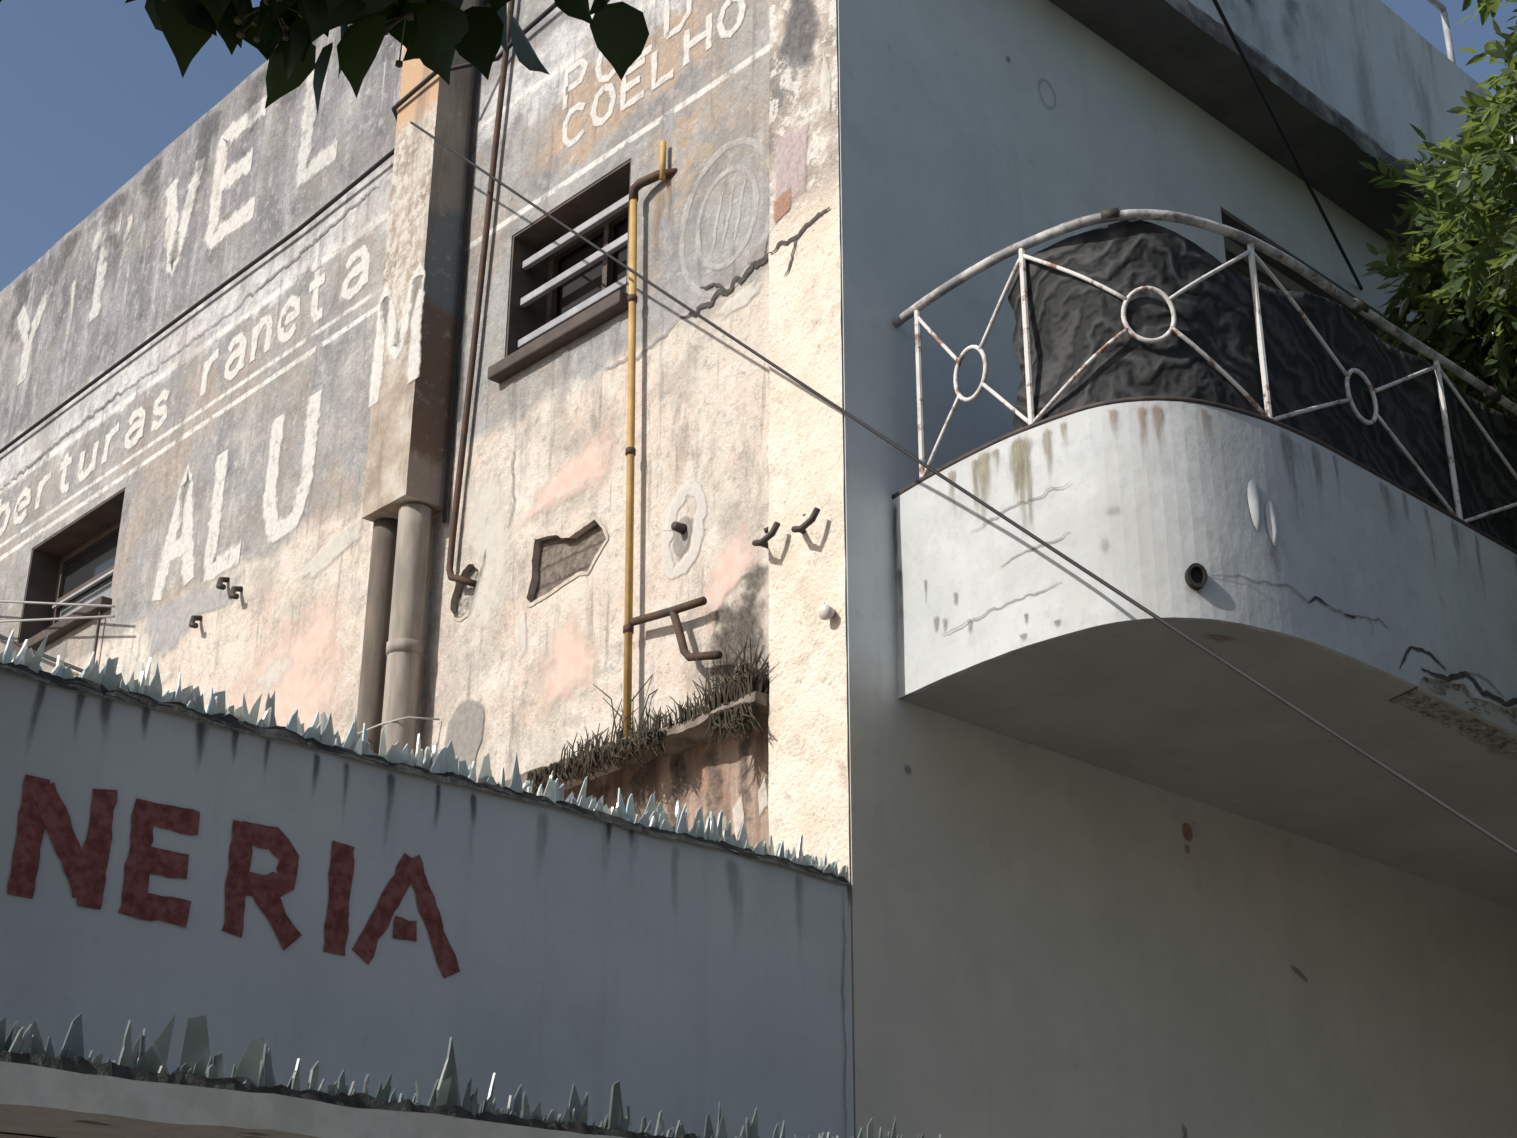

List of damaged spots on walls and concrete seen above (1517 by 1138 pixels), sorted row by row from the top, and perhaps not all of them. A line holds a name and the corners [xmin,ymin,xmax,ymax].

leakage [781,0,830,109]
crack [603,207,830,370]
leakage [33,683,46,723]
leakage [198,723,206,754]
peeling [448,425,612,627]
flaking render [516,515,608,657]
leakage [706,566,767,691]
crack [1208,574,1517,707]
spalling [1389,677,1517,756]